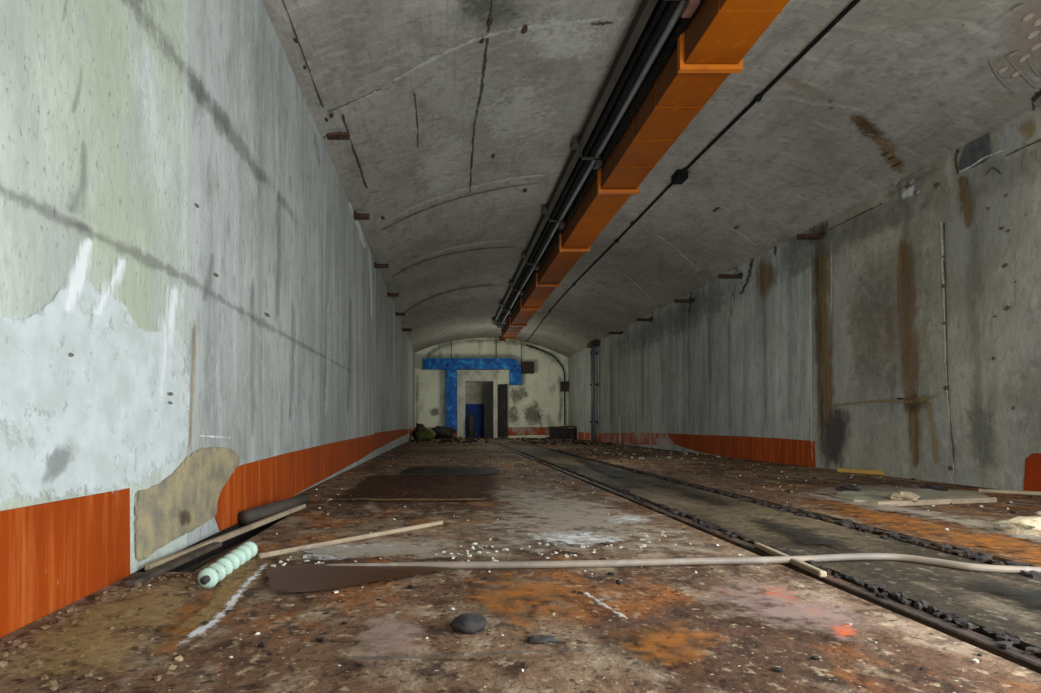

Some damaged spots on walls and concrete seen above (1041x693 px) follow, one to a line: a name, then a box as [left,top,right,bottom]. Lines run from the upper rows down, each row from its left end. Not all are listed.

leakage [522,18,599,59]
crack [412,94,420,148]
crack [469,0,492,193]
corrosion [851,116,904,172]
spalling [954,132,1003,175]
corrosion [809,224,939,466]
spalling [134,435,240,561]